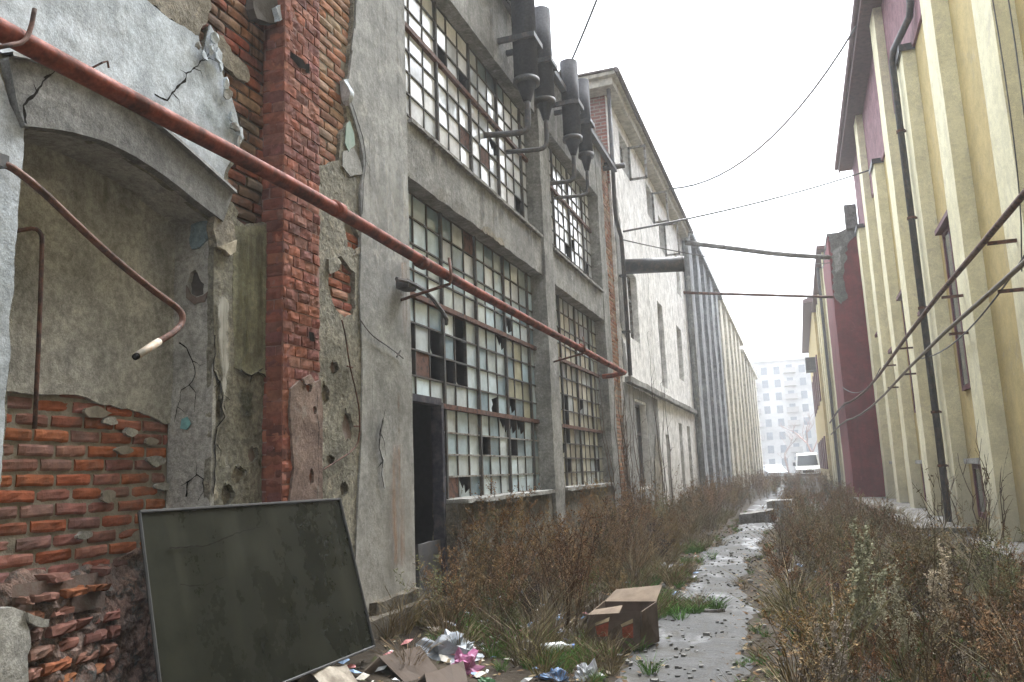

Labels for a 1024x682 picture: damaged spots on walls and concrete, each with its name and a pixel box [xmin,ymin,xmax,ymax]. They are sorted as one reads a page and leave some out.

crack [23,71,55,124]
crack [155,43,215,104]
flaking render [148,0,282,160]
flaking render [189,164,263,256]
flaking render [344,223,360,256]
flaking render [186,272,208,304]
flaking render [326,257,352,317]
crack [174,335,266,501]
flaking render [288,360,341,501]
flaking render [0,392,191,583]